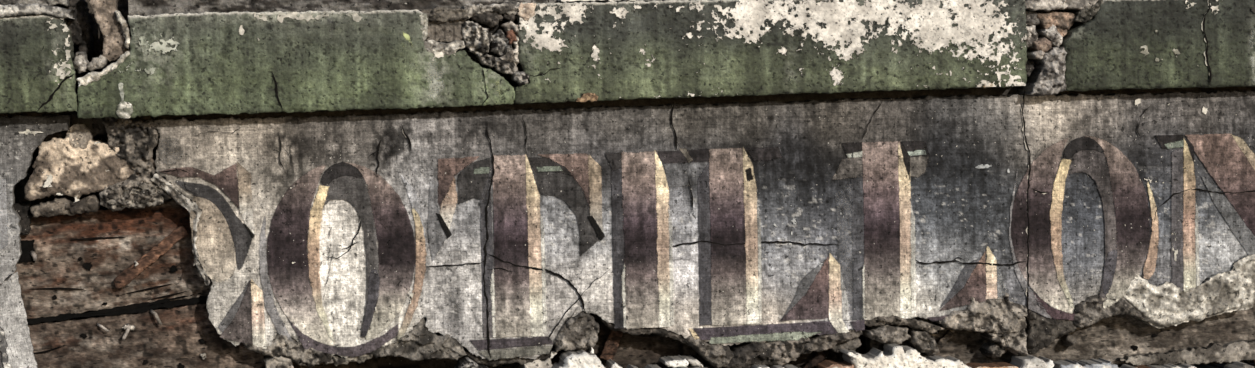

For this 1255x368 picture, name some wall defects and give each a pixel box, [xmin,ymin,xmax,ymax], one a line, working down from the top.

spalling [45,0,210,285]
spalling [419,2,594,86]
spalling [575,93,598,102]
peeling [588,0,1103,96]
peeling [1140,45,1180,61]
crack [1201,2,1212,84]
crack [427,67,610,359]
crack [916,94,1047,316]
spalling [243,254,1255,368]